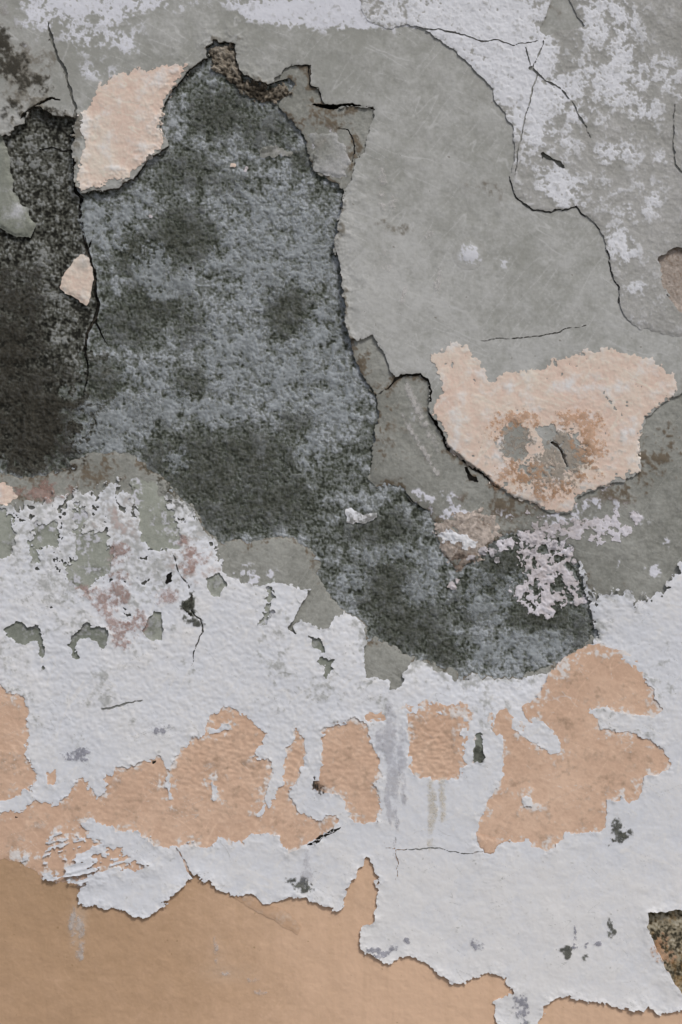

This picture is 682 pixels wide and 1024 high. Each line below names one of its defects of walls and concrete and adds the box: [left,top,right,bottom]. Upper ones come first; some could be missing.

crack [416,26,586,126]
crack [21,42,235,396]
crack [510,180,620,301]
damp [0,184,357,502]
spalling [0,40,677,853]
damp [77,572,148,648]
damp [161,592,202,627]
damp [343,545,440,604]
damp [466,573,572,664]
peeling [0,684,514,1024]
spalling [647,909,682,992]
peeling [538,995,682,1024]